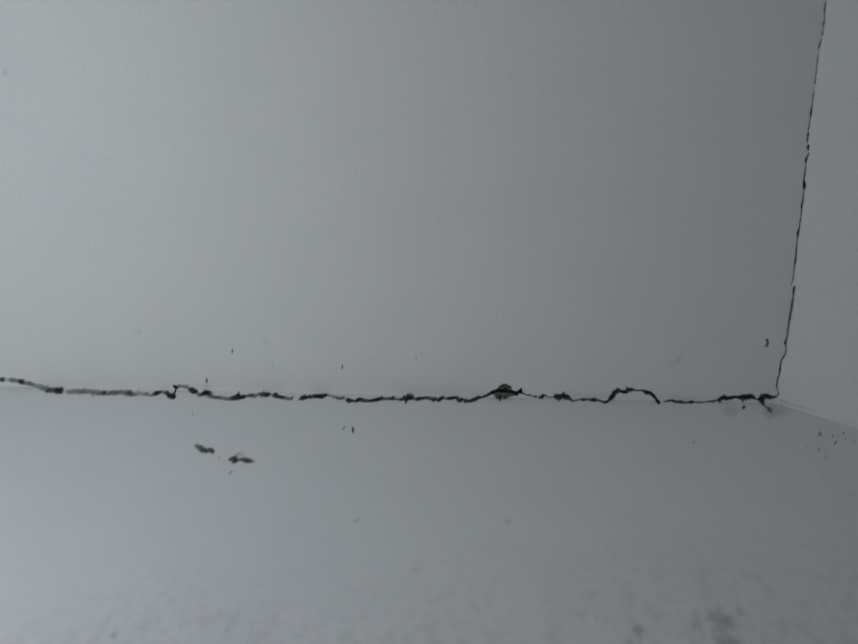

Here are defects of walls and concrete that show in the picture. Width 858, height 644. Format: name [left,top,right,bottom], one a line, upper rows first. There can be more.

crack [0,378,493,404]
crack [523,2,826,412]